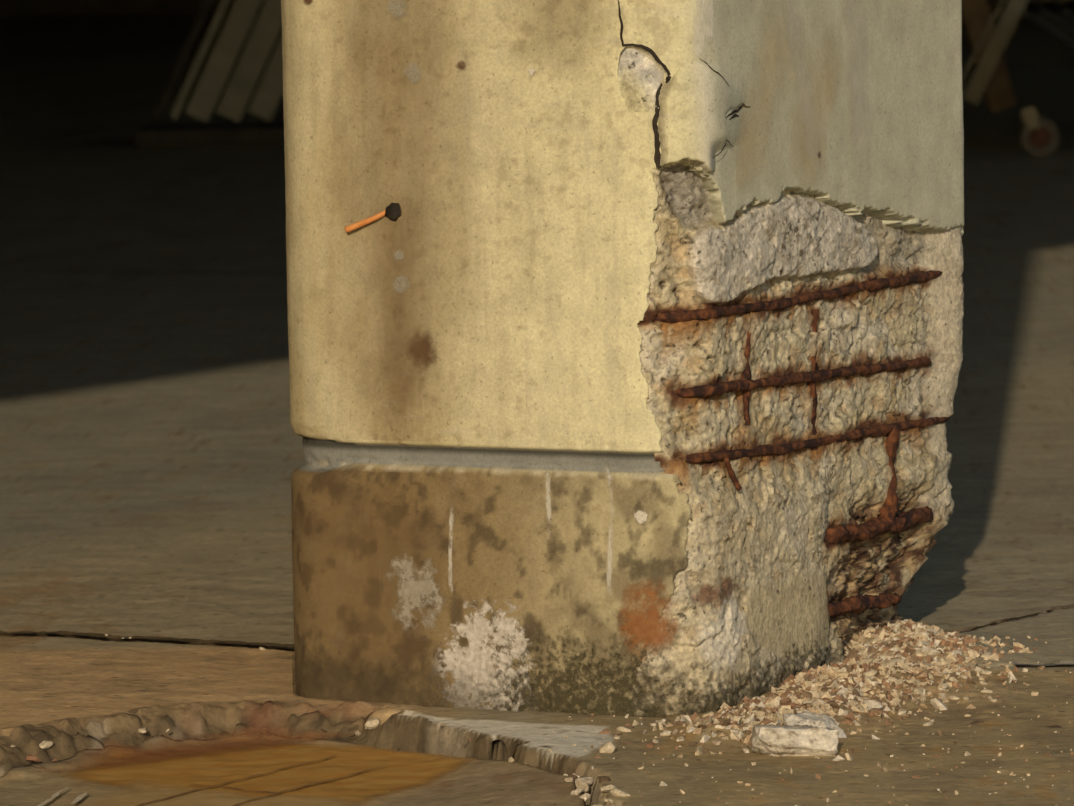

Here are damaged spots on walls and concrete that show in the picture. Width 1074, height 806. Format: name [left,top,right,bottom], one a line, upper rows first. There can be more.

crack [618,0,671,168]
spalling [618,46,964,716]
damp [389,558,443,627]
rust [621,584,676,648]
crack [944,604,1074,633]
crack [136,755,384,806]